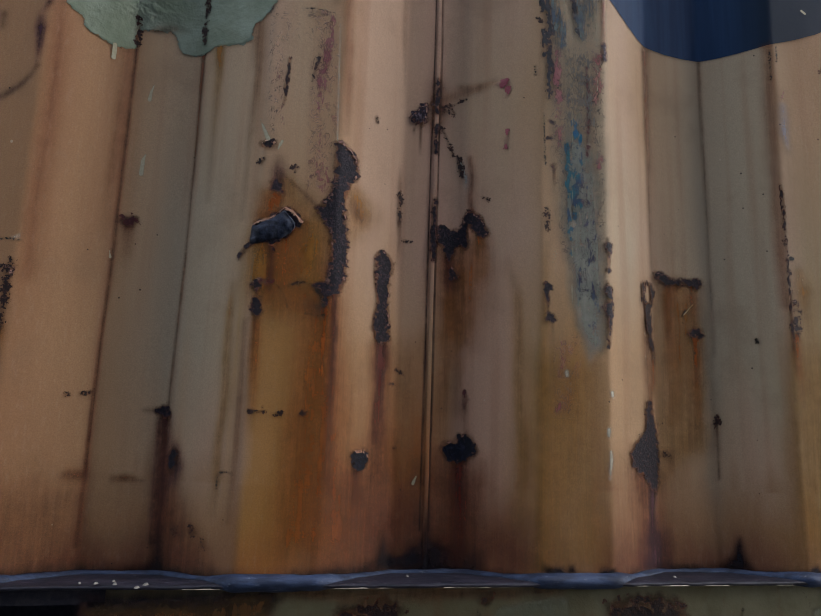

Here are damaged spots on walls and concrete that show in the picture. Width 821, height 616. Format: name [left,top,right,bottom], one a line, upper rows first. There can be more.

peeling [539,0,555,99]
corrosion [0,255,17,333]
corrosion [294,0,481,575]
peeling [543,281,557,323]
corrosion [641,280,655,394]
corrosion [336,596,409,616]
corrosion [602,593,689,616]